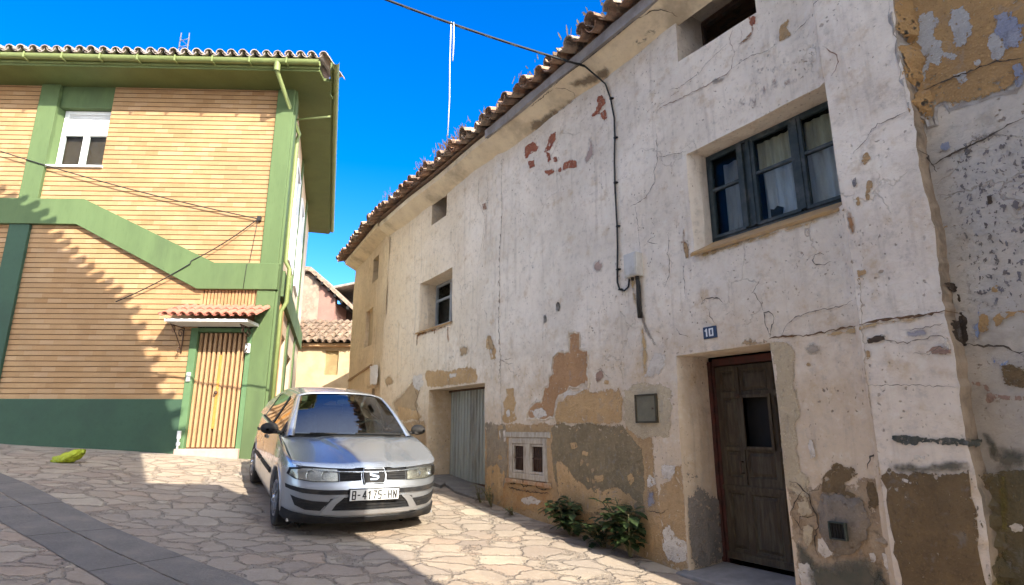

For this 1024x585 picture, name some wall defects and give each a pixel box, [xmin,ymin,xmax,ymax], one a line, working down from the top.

flaking render [524,132,593,176]
flaking render [592,95,607,120]
crack [659,28,776,109]
crack [853,107,926,153]
flaking render [888,0,1024,130]
crack [631,140,722,322]
flaking render [394,347,478,446]
flaking render [485,329,723,571]
flaking render [742,339,1024,585]